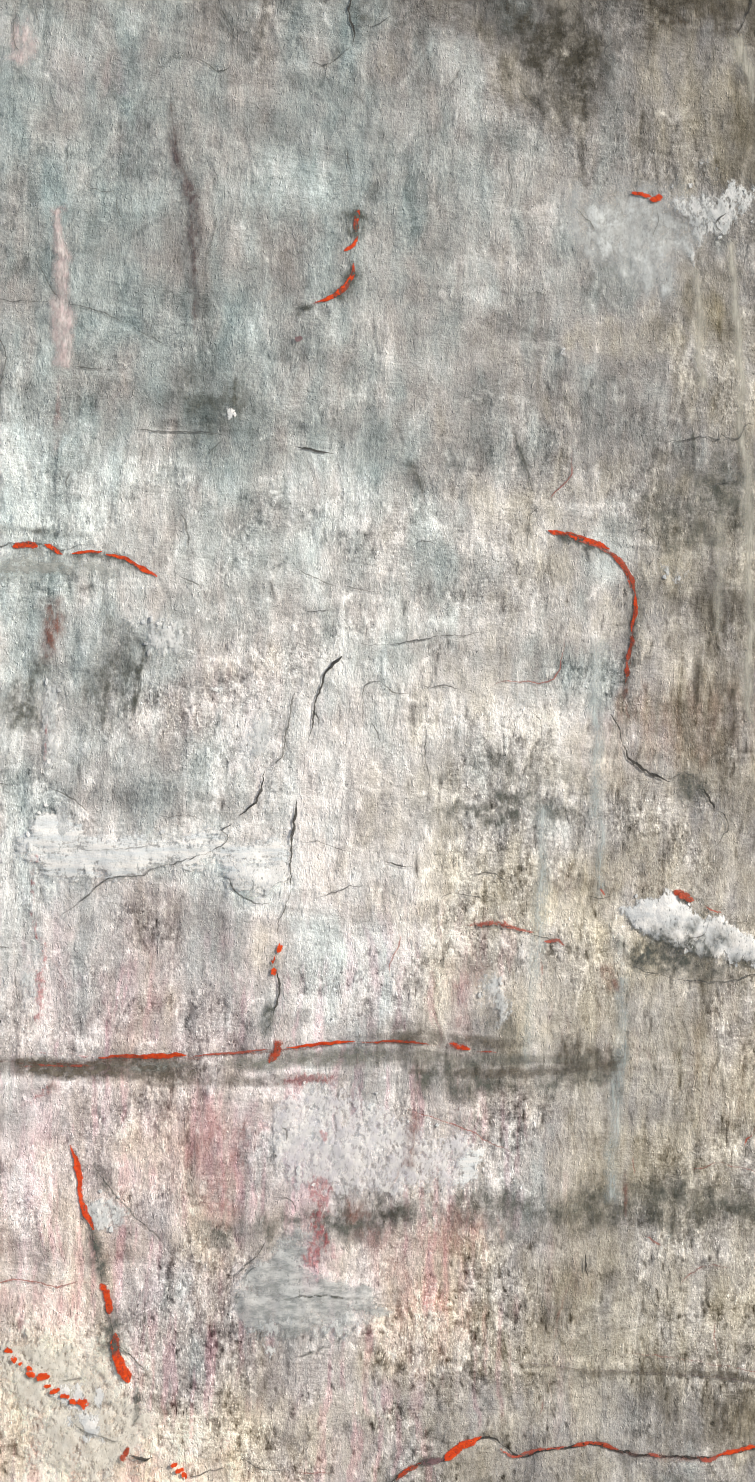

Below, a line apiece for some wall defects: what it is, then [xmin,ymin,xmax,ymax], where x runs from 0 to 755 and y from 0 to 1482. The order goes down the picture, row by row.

crack [300,209,368,311]
crack [0,514,199,585]
crack [516,439,729,845]
crack [15,633,567,1084]
flaking render [618,888,755,974]
crack [0,1145,178,1462]
crack [192,1457,326,1477]
crack [392,1434,755,1482]